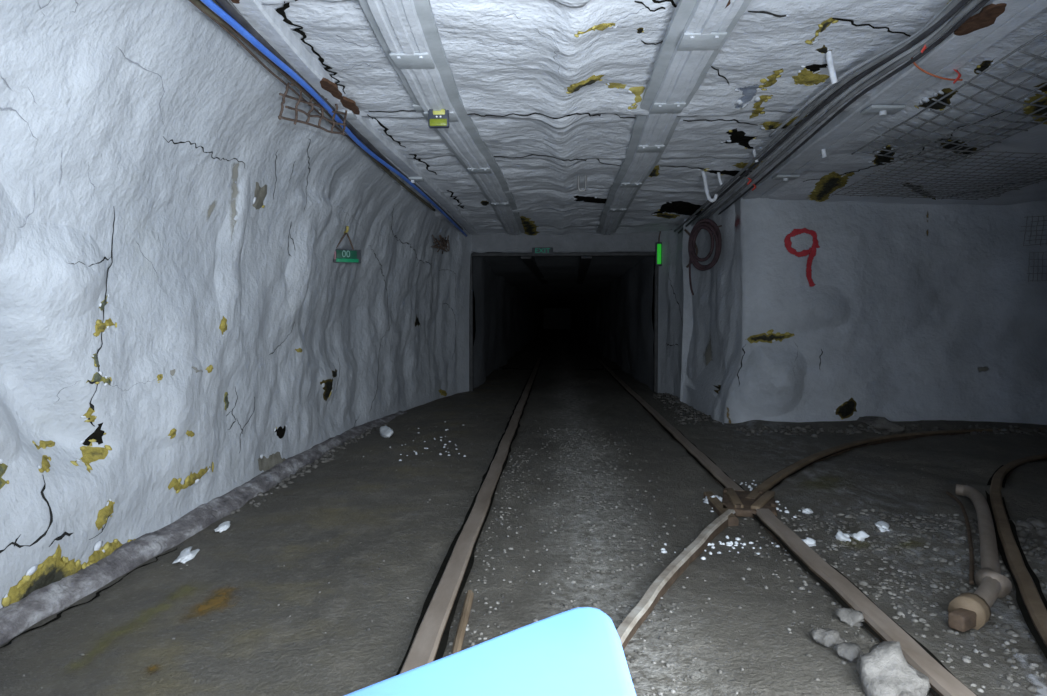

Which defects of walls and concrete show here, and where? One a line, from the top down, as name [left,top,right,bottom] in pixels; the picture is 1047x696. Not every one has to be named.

spalling [574,23,617,37]
crack [619,0,677,20]
crack [748,10,786,18]
rust [954,3,1007,36]
spalling [974,59,995,75]
spalling [566,75,645,112]
spalling [915,88,958,111]
spalling [1023,82,1047,128]
spalling [70,407,112,473]
spalling [168,462,214,493]
crack [0,476,110,553]
spalling [1,499,136,608]